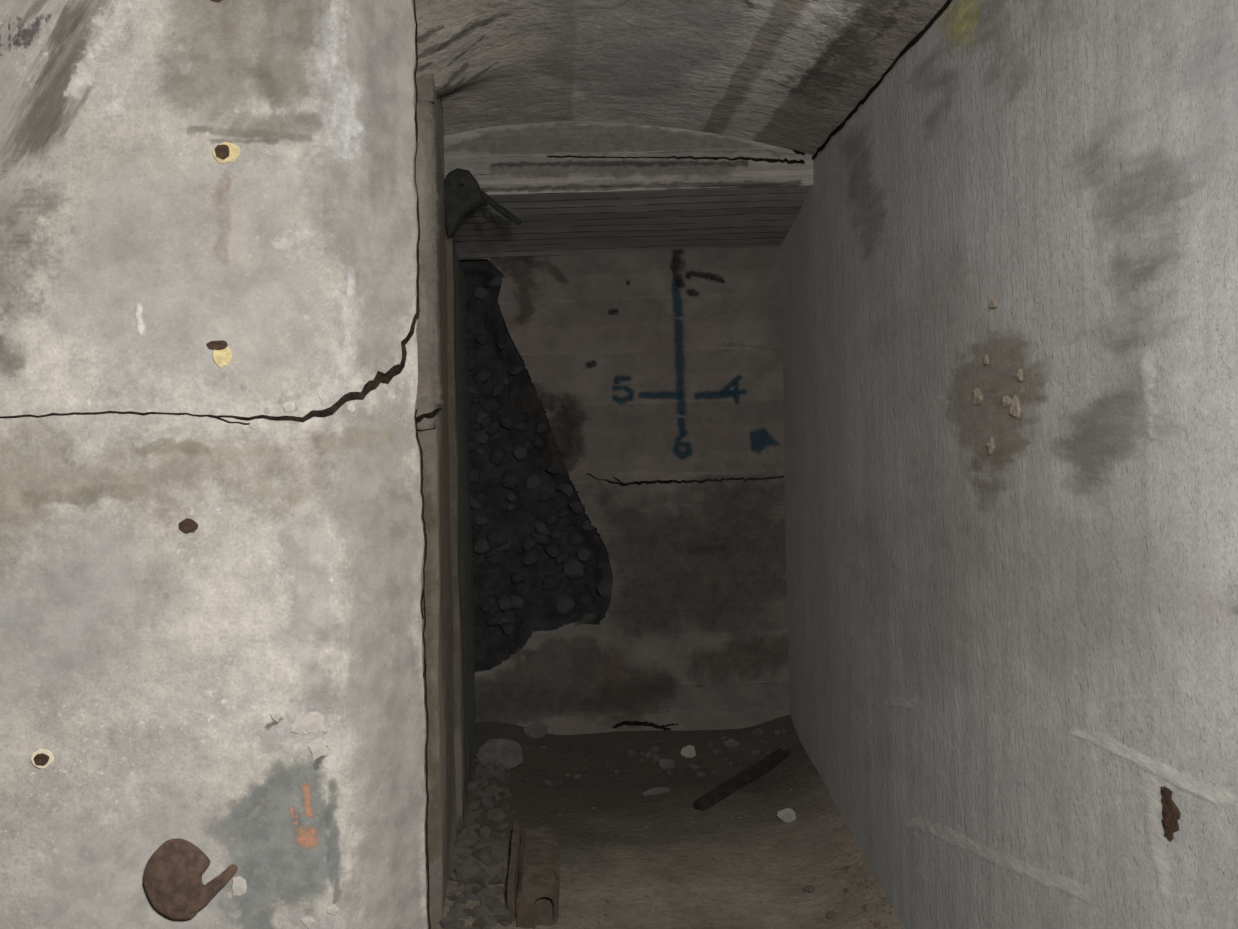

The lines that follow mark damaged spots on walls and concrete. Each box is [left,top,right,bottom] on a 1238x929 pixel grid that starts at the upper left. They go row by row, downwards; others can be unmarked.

leakage [0,0,134,188]
crack [0,0,420,430]
leakage [172,0,512,388]
crack [547,0,952,164]
crack [414,407,442,929]
leakage [282,144,668,929]
crack [587,473,784,486]